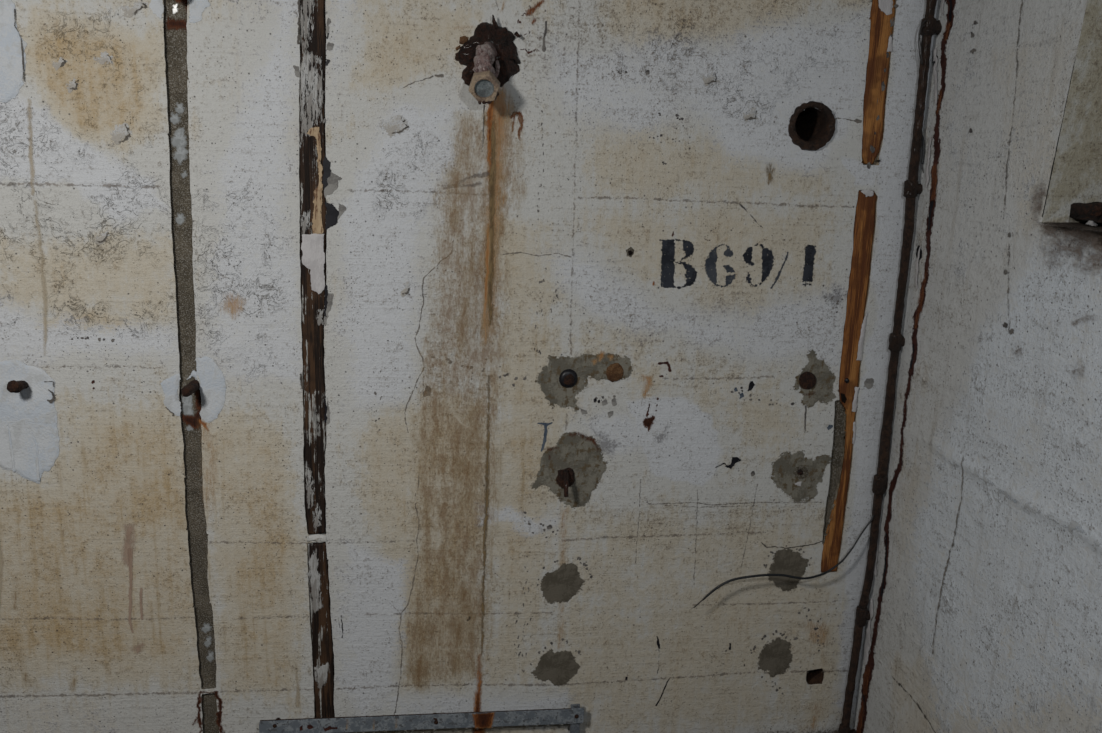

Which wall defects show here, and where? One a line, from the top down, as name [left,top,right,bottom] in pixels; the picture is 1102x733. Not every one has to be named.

rust [455,1,544,337]
rust [181,389,207,429]
crack [394,477,419,713]
rust [260,376,571,733]